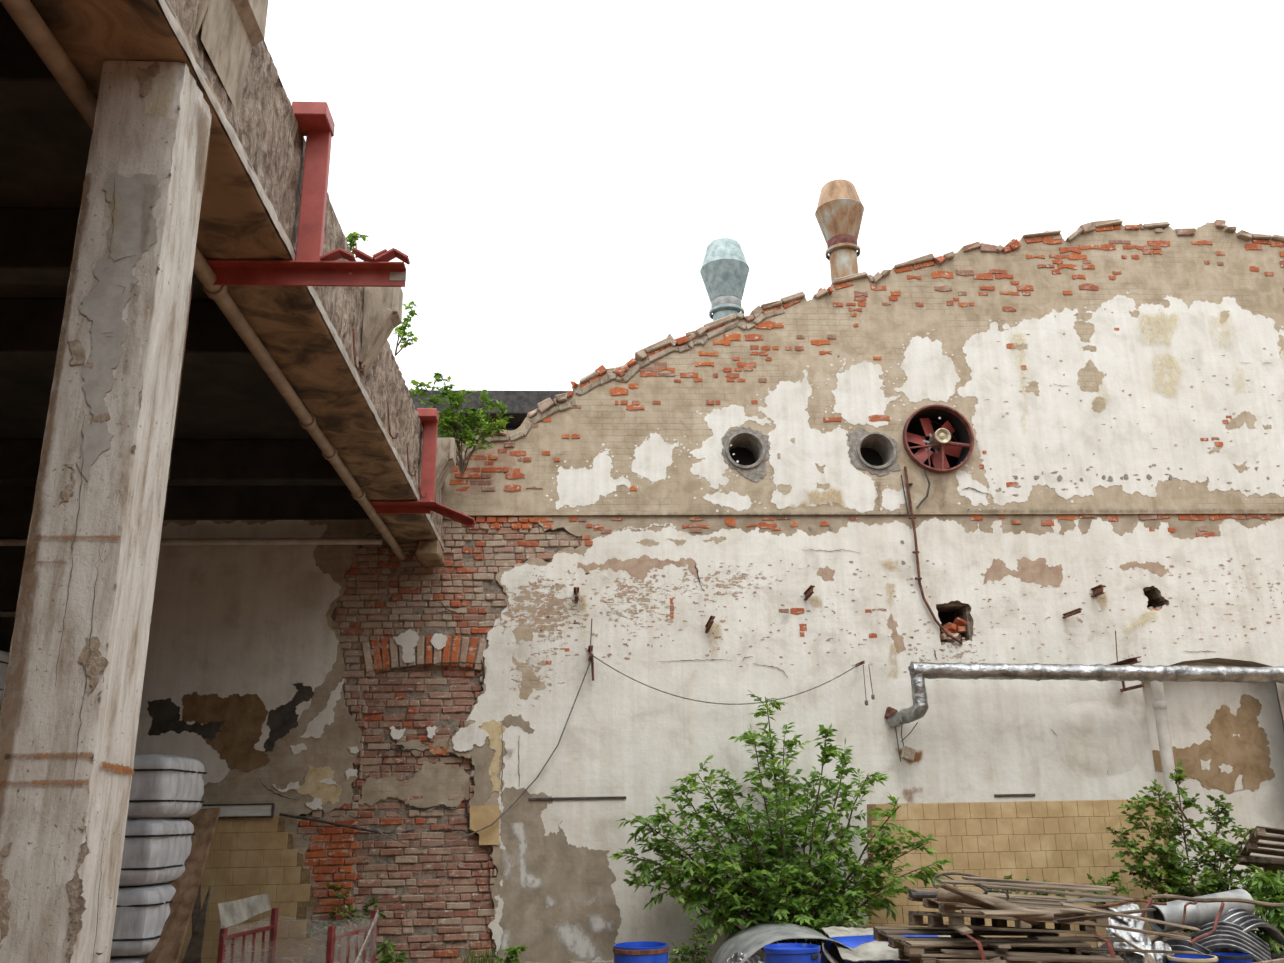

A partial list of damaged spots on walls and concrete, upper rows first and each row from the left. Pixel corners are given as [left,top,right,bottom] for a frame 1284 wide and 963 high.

spalling [137,62,161,97]
spalling [67,340,94,369]
peeling [273,237,1284,963]
spalling [78,637,109,701]
spalling [182,691,270,773]
crack [381,745,425,753]
crack [501,725,520,806]
crack [369,798,479,841]
spalling [0,842,13,949]
spalling [66,816,90,963]